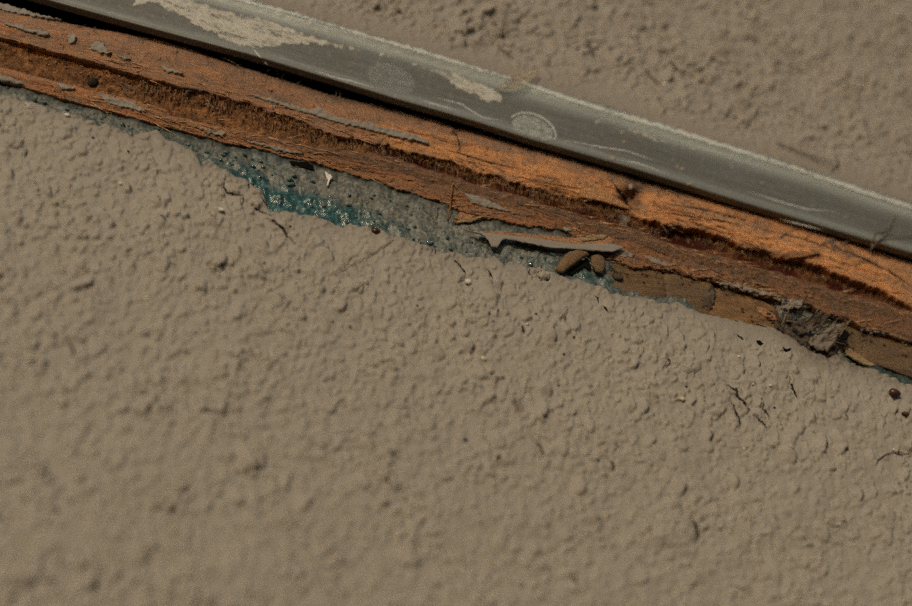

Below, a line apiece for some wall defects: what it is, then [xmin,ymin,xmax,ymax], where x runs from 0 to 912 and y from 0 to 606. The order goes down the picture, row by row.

peeling [0,3,62,37]
peeling [98,94,146,113]
peeling [249,94,429,146]
peeling [464,193,518,214]
peeling [719,281,803,308]